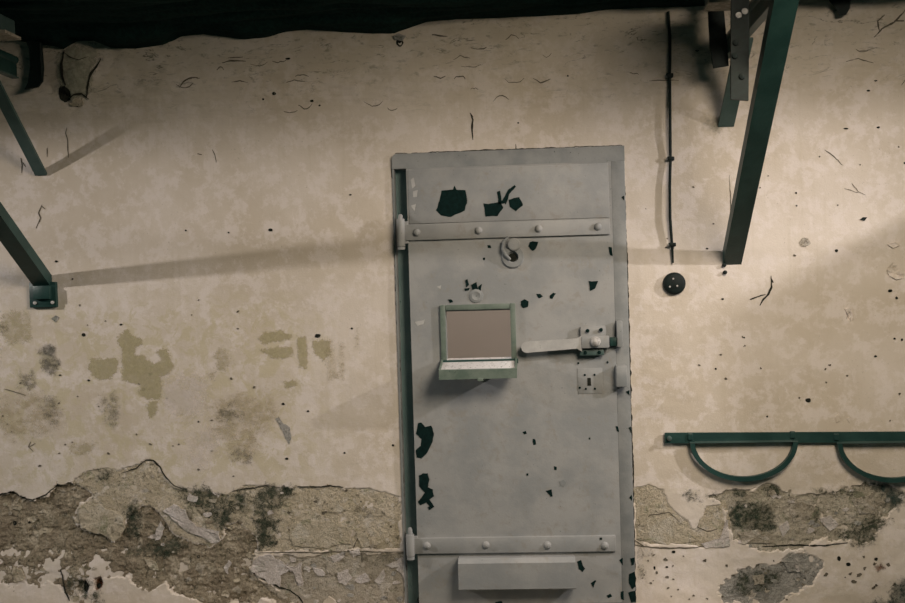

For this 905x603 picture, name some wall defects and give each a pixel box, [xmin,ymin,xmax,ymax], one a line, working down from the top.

damp [38,345,60,374]
flaking render [0,461,405,603]
flaking render [607,482,905,603]